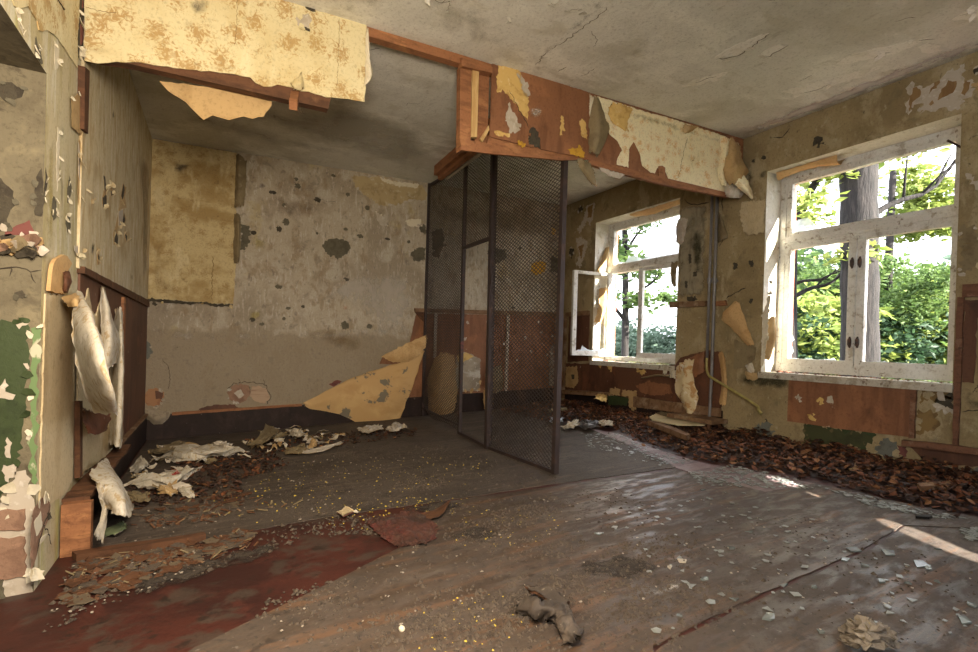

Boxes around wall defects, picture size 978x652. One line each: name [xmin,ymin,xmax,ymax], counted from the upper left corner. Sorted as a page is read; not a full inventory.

crack [535,8,607,77]
spalling [505,116,541,149]
peeling [240,224,256,250]
peeling [316,228,363,260]
peeling [916,391,953,431]
peeling [0,317,51,599]